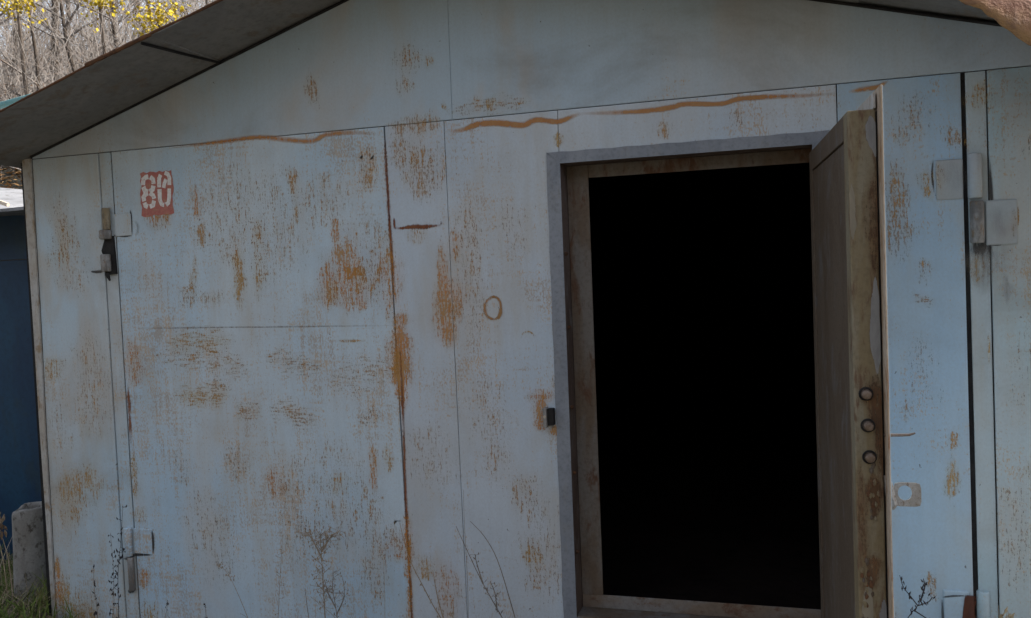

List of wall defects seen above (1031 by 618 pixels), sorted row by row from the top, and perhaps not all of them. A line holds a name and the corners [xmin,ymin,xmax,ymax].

corrosion [442,98,572,147]
corrosion [615,95,795,126]
corrosion [865,163,912,271]
corrosion [432,199,502,346]
corrosion [156,327,243,407]
corrosion [192,111,459,618]
corrosion [866,375,883,472]
corrosion [945,463,959,496]